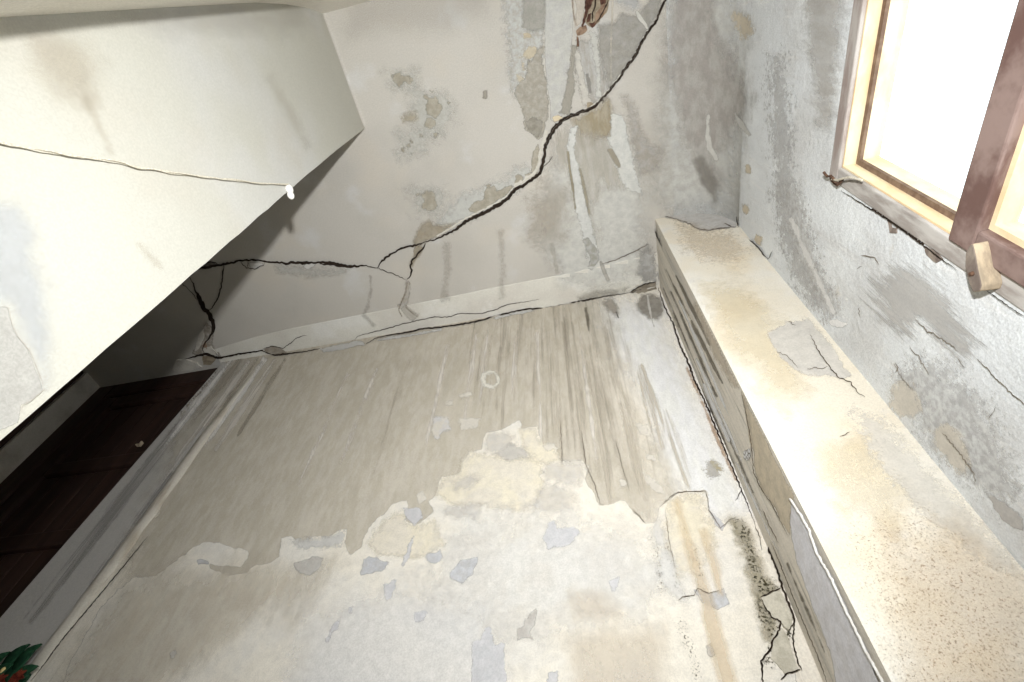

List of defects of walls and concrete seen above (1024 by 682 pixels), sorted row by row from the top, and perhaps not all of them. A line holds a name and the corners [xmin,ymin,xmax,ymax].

peeling [391,73,451,133]
crack [182,0,667,359]
water stain [135,0,791,663]
peeling [414,0,562,225]
spalling [576,0,609,36]
peeling [768,57,851,378]
peeling [64,392,797,682]
crack [356,276,827,682]
water stain [786,563,824,650]